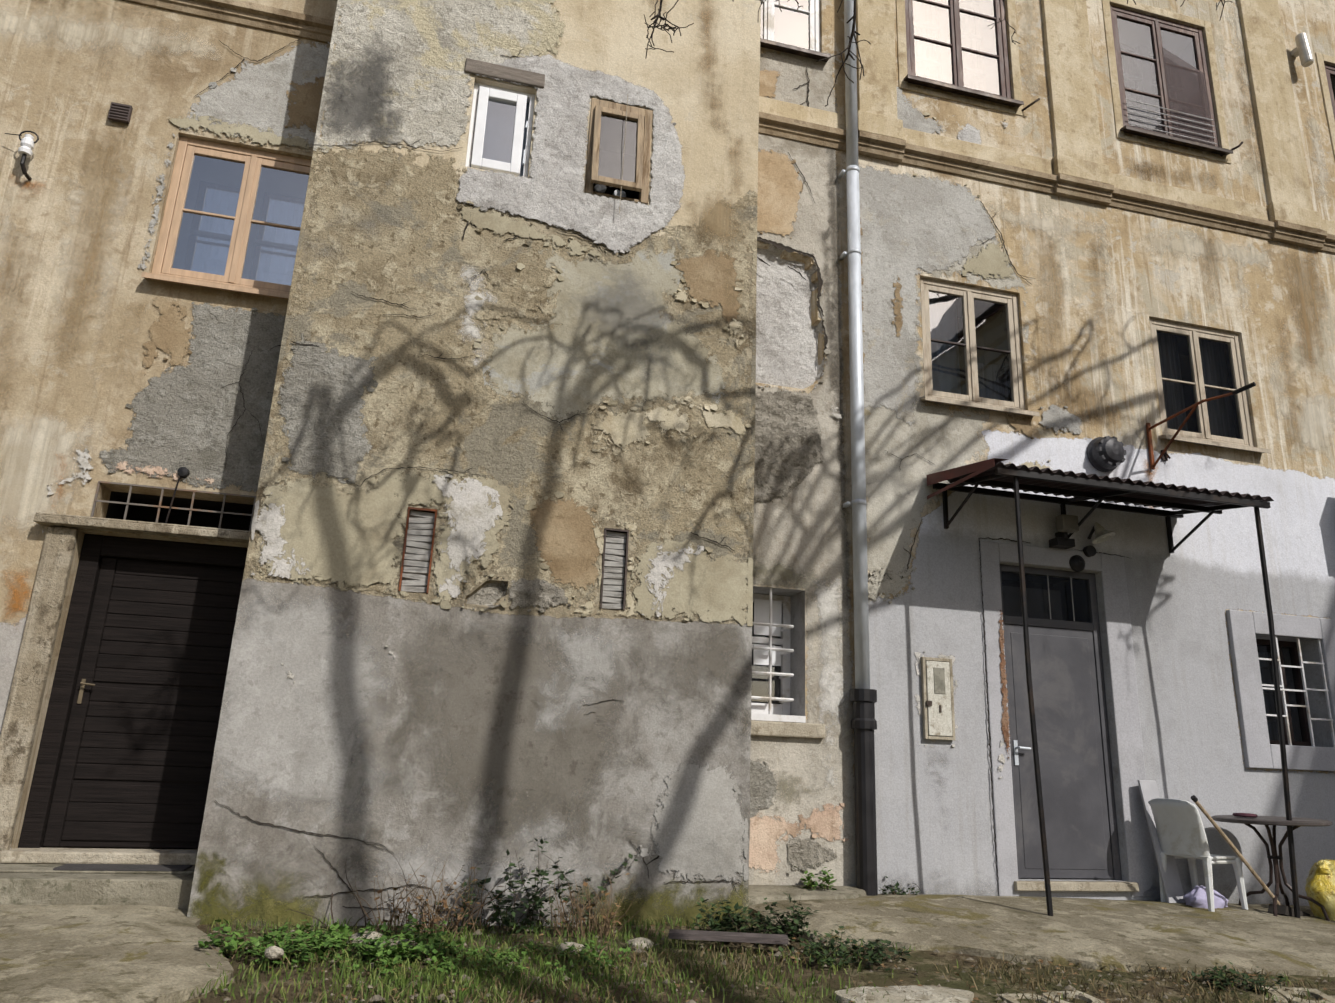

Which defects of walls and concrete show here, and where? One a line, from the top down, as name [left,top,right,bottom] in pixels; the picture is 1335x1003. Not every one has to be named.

flaking render [47,296,379,495]
crack [222,341,317,468]
flaking render [592,149,842,504]
flaking render [859,165,998,426]
water stain [1273,256,1335,449]
flaking render [440,491,604,617]
crack [215,800,431,910]
flaking render [749,759,849,875]